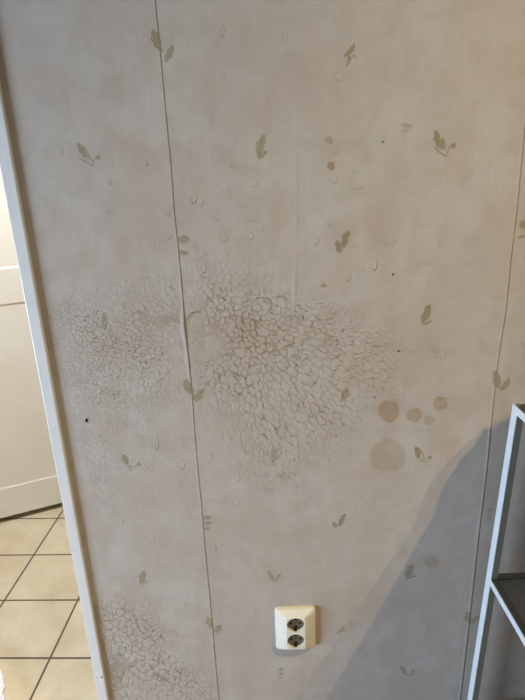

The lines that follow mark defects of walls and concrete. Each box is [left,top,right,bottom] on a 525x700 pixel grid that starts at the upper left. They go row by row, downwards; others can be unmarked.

crack [46,0,442,700]
water stain [95,269,485,479]